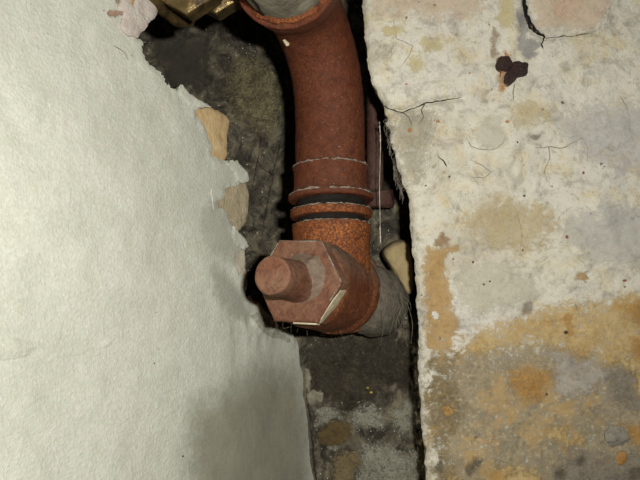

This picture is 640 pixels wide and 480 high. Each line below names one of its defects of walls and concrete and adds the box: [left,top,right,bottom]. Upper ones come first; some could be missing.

peeling [108,0,158,38]
crack [522,0,596,48]
crack [385,98,458,124]
flaking render [177,85,249,279]
leakage [391,233,640,480]